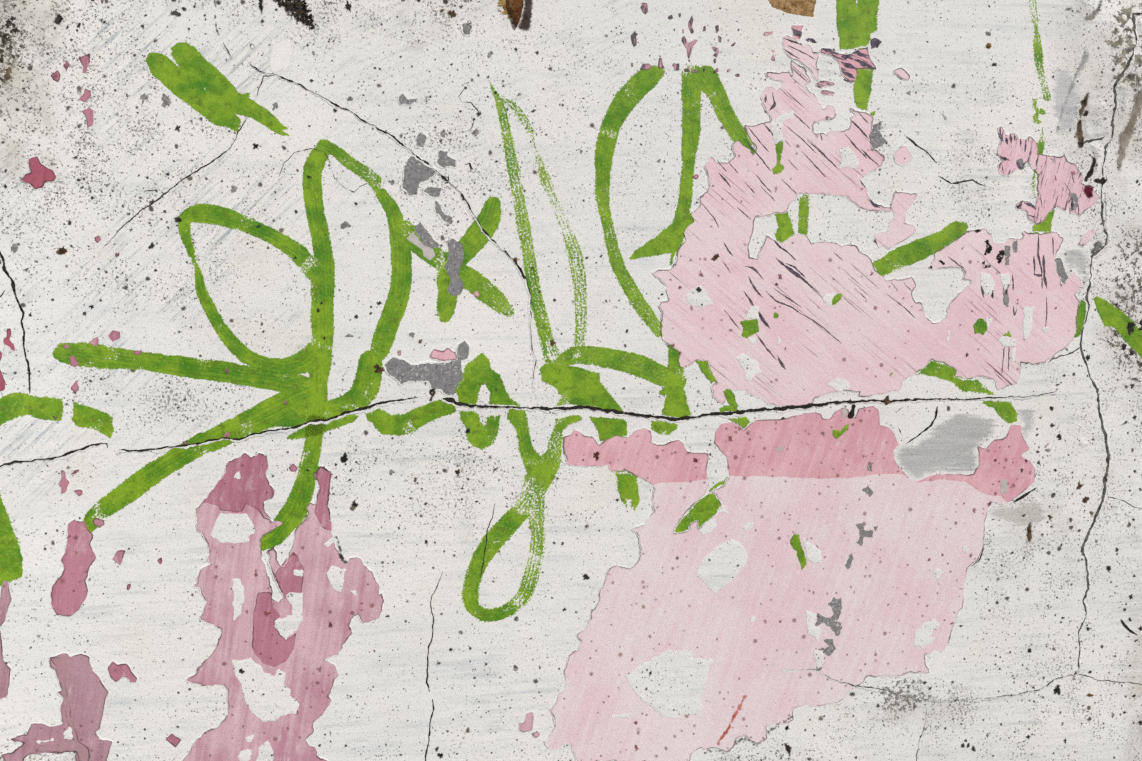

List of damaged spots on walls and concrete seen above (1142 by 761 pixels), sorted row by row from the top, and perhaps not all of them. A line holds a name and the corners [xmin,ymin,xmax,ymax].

corrosion [497,0,522,24]
peeling [21,156,57,190]
crack [0,43,1058,469]
peeling [64,344,79,395]
peeling [518,0,1100,761]
crack [782,13,1142,761]
peeling [50,518,104,617]
peeling [113,550,125,565]
peeling [166,452,390,761]
crack [480,505,495,578]
crack [425,575,442,761]